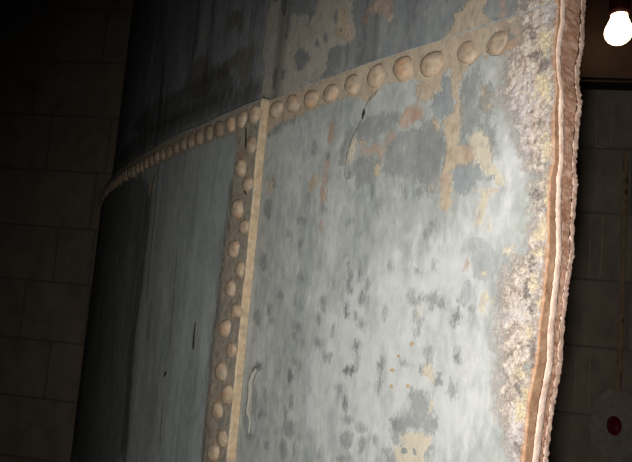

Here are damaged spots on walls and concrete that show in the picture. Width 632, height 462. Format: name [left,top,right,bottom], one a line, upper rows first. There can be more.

peeling [437,0,506,40]
crack [345,133,357,163]
peeling [436,77,508,232]
peeling [202,0,356,462]
peeling [393,429,435,462]